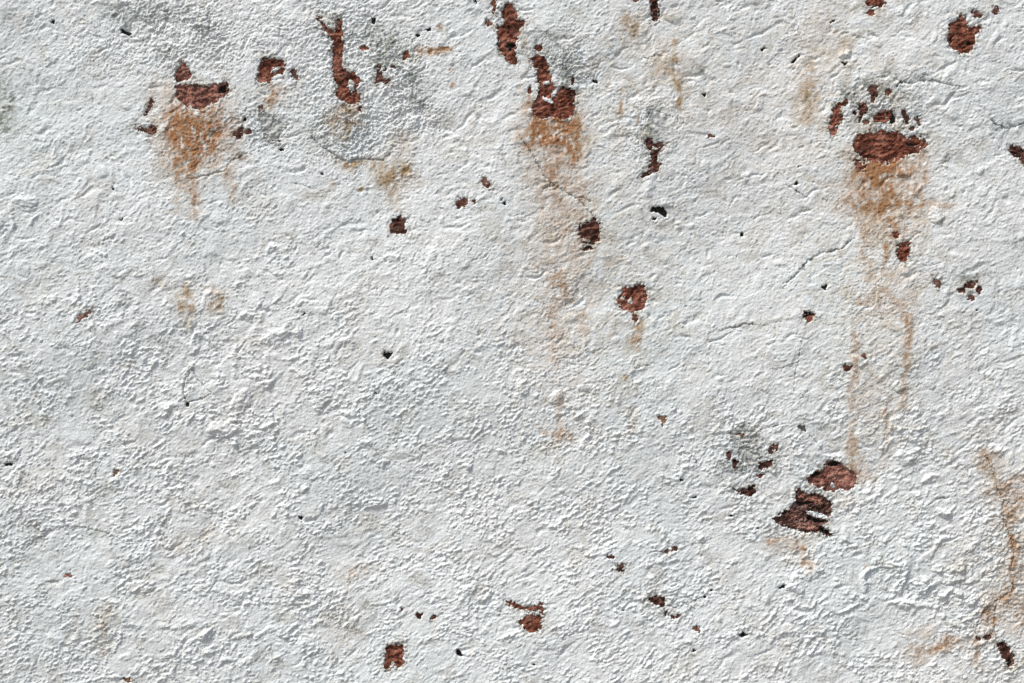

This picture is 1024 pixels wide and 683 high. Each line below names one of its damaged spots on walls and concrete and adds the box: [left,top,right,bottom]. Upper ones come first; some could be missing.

spalling [174,61,229,111]
spalling [256,54,299,85]
spalling [314,14,410,113]
spalling [485,0,579,122]
spalling [947,6,1000,56]
rust [164,103,232,214]
rust [524,102,582,183]
spalling [828,85,930,173]
rust [852,158,915,220]
spalling [615,282,649,324]
spalling [772,457,859,538]
spalling [506,600,548,633]